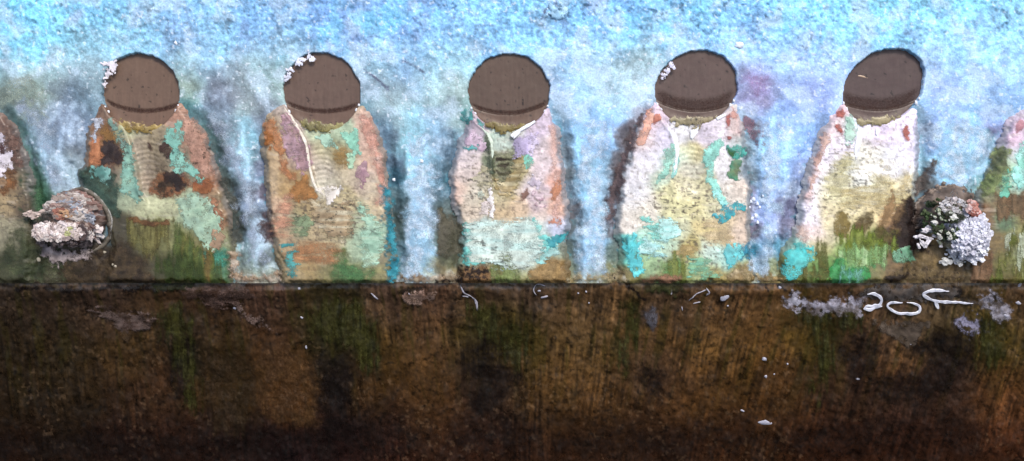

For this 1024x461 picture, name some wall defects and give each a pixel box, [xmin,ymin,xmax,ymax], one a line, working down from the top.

peeling [22,192,105,244]
damp [657,152,1024,311]